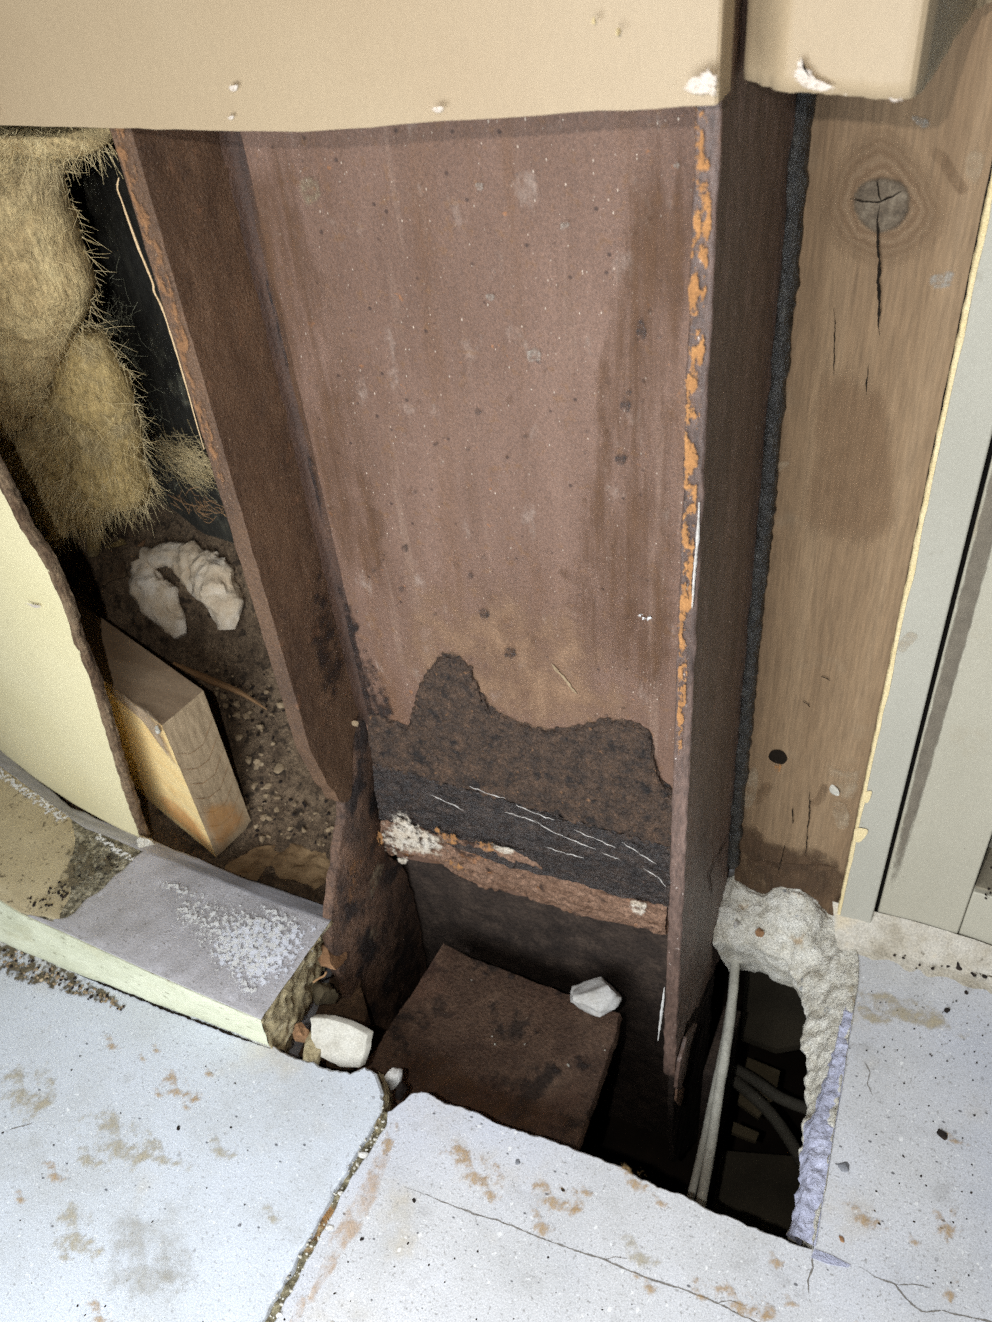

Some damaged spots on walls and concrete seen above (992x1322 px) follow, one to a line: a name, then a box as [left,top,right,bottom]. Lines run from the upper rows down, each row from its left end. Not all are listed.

crack [854,181,902,334]
corrosion [677,111,712,751]
water stain [735,830,844,916]
spalling [713,875,859,1251]
crack [405,1187,756,1322]
crack [806,1259,814,1292]
crack [860,1267,991,1322]